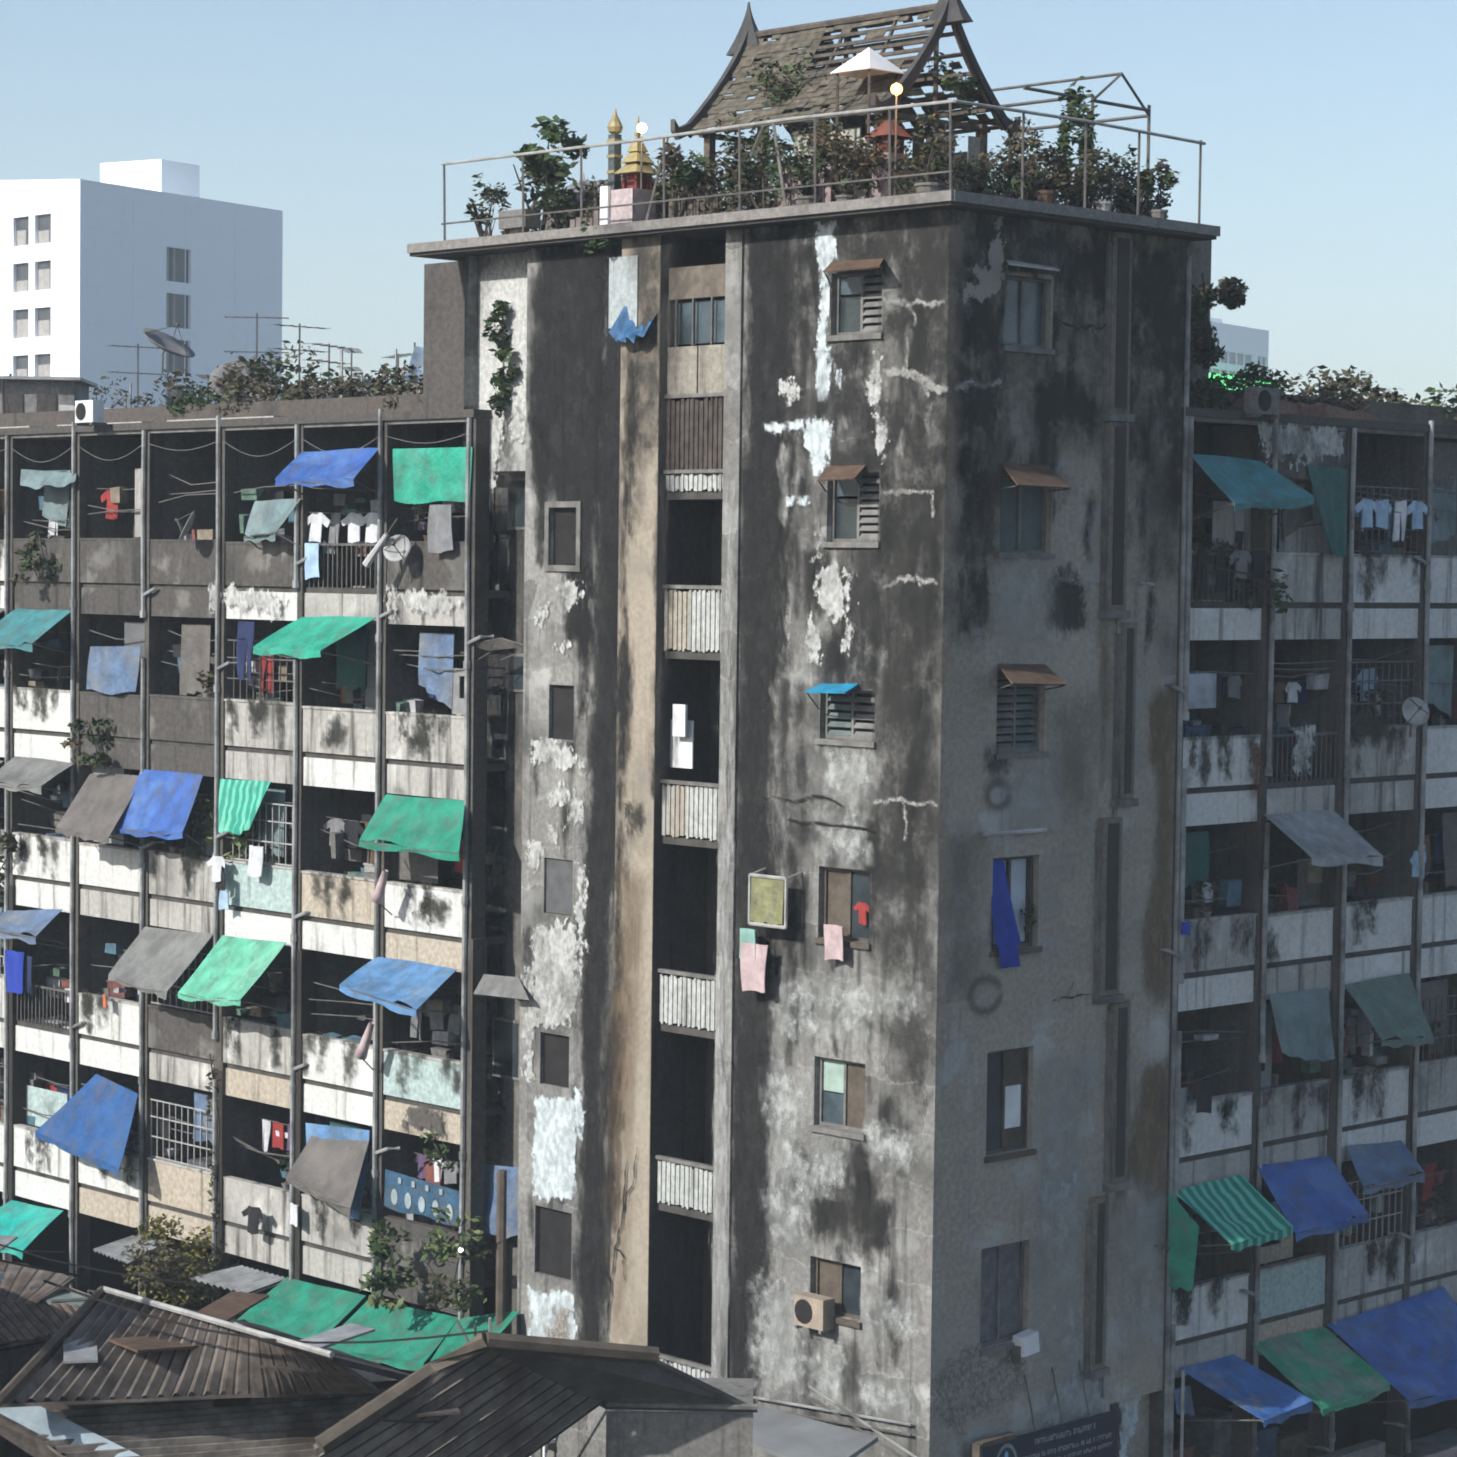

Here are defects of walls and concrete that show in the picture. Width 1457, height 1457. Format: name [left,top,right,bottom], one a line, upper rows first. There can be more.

peeling [765,220,842,476]
peeling [1258,421,1344,472]
peeling [786,496,810,506]
damp [225,698,284,750]
damp [320,715,346,747]
damp [485,235,673,1342]
damp [713,212,1191,1404]
peeling [520,862,589,1203]
peeling [527,1285,578,1340]
damp [801,1340,815,1420]